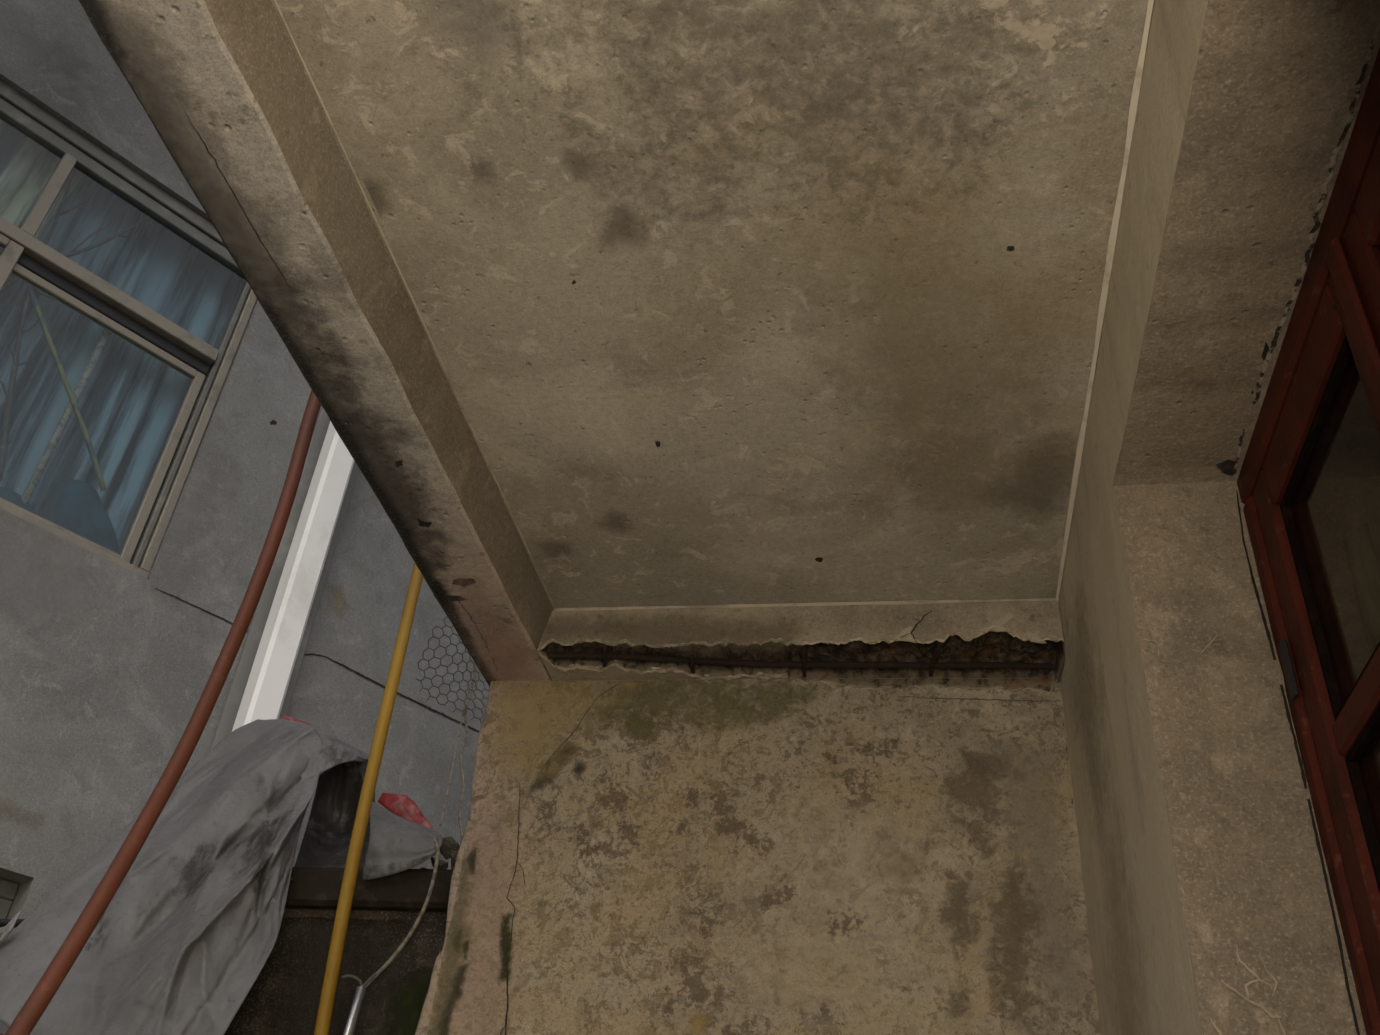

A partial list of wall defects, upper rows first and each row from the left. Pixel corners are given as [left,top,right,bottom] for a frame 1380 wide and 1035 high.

crack [155,588,248,632]
crack [304,653,479,732]
spalling [537,612,1065,696]
crack [500,681,623,1035]
leakage [941,871,1043,1020]